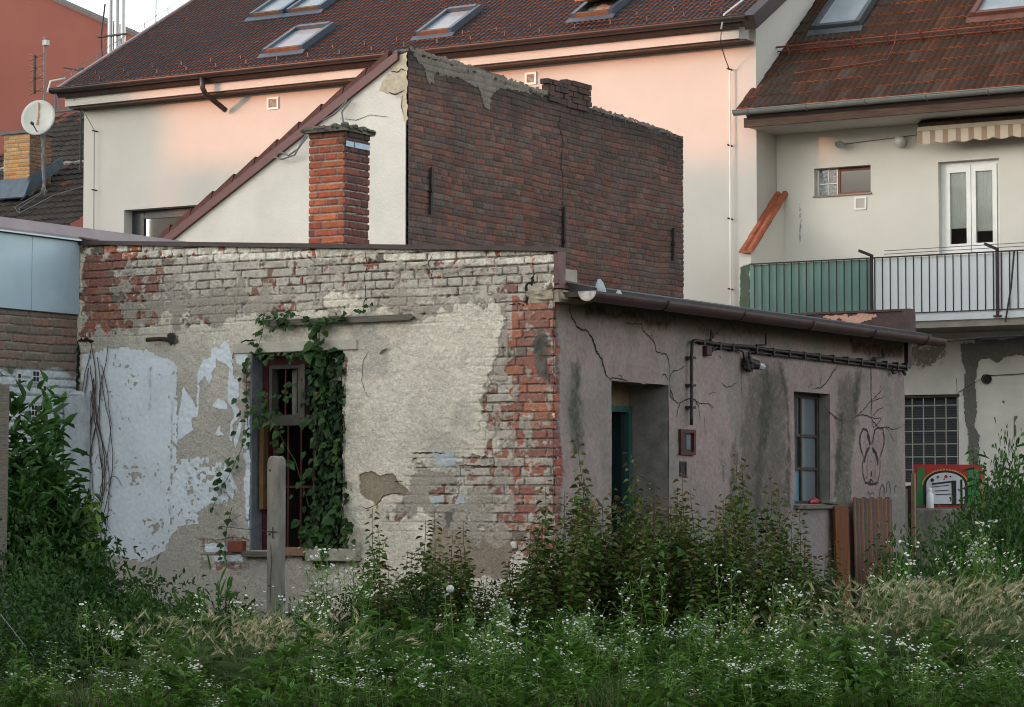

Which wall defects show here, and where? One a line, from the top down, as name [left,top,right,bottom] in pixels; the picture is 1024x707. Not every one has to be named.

peeling [823,313,877,323]
flaking render [78,245,565,580]
crack [626,323,742,418]
crack [808,364,902,443]
leakage [722,370,791,562]